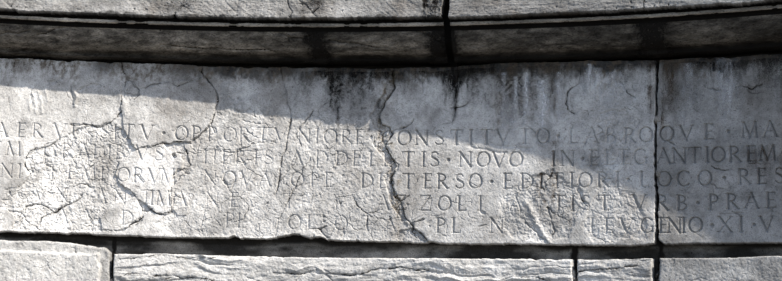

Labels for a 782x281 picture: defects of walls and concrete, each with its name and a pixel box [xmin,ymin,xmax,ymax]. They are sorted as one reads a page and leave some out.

water stain [303,32,405,119]
water stain [425,31,547,127]